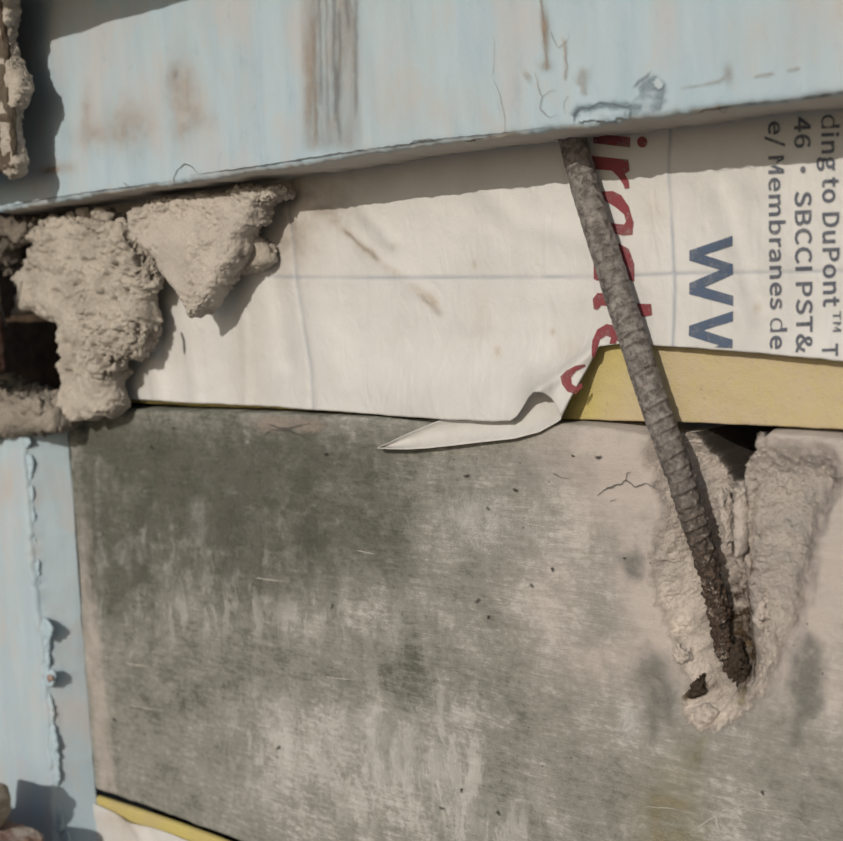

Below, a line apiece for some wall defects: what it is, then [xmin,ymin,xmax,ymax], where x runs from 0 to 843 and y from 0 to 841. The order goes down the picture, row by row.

peeling [633,72,664,109]
peeling [572,101,641,124]
spalling [647,425,841,732]